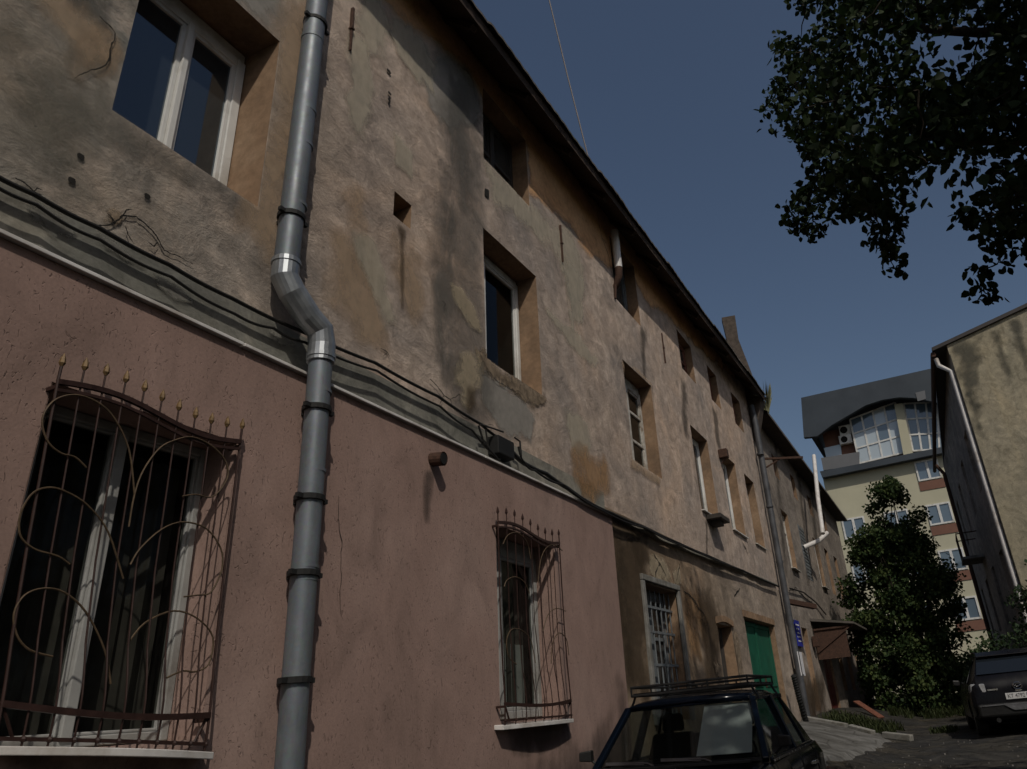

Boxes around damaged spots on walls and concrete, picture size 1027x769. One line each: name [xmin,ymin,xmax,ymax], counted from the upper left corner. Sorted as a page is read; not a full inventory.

crack [75,16,116,78]
flaking render [348,0,735,378]
crack [100,209,193,264]
flaking render [475,347,547,408]
water stain [954,342,980,411]